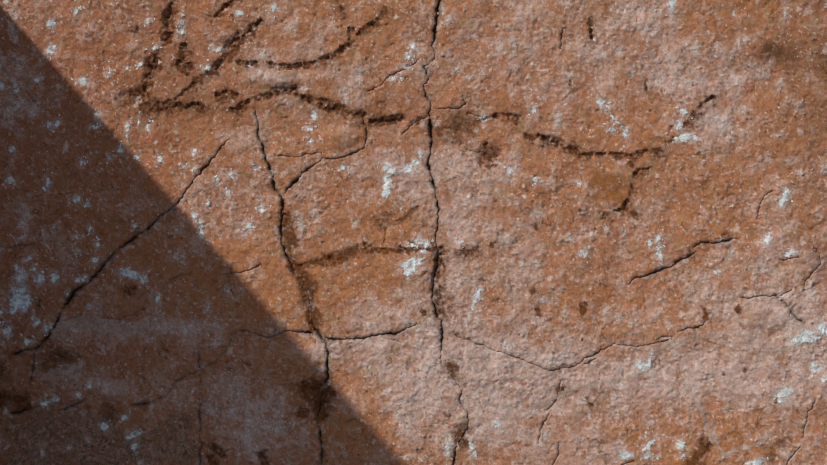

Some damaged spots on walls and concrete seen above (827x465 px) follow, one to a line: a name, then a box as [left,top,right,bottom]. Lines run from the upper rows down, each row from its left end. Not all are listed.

crack [6,138,231,416]
crack [131,0,708,465]
crack [627,236,737,286]